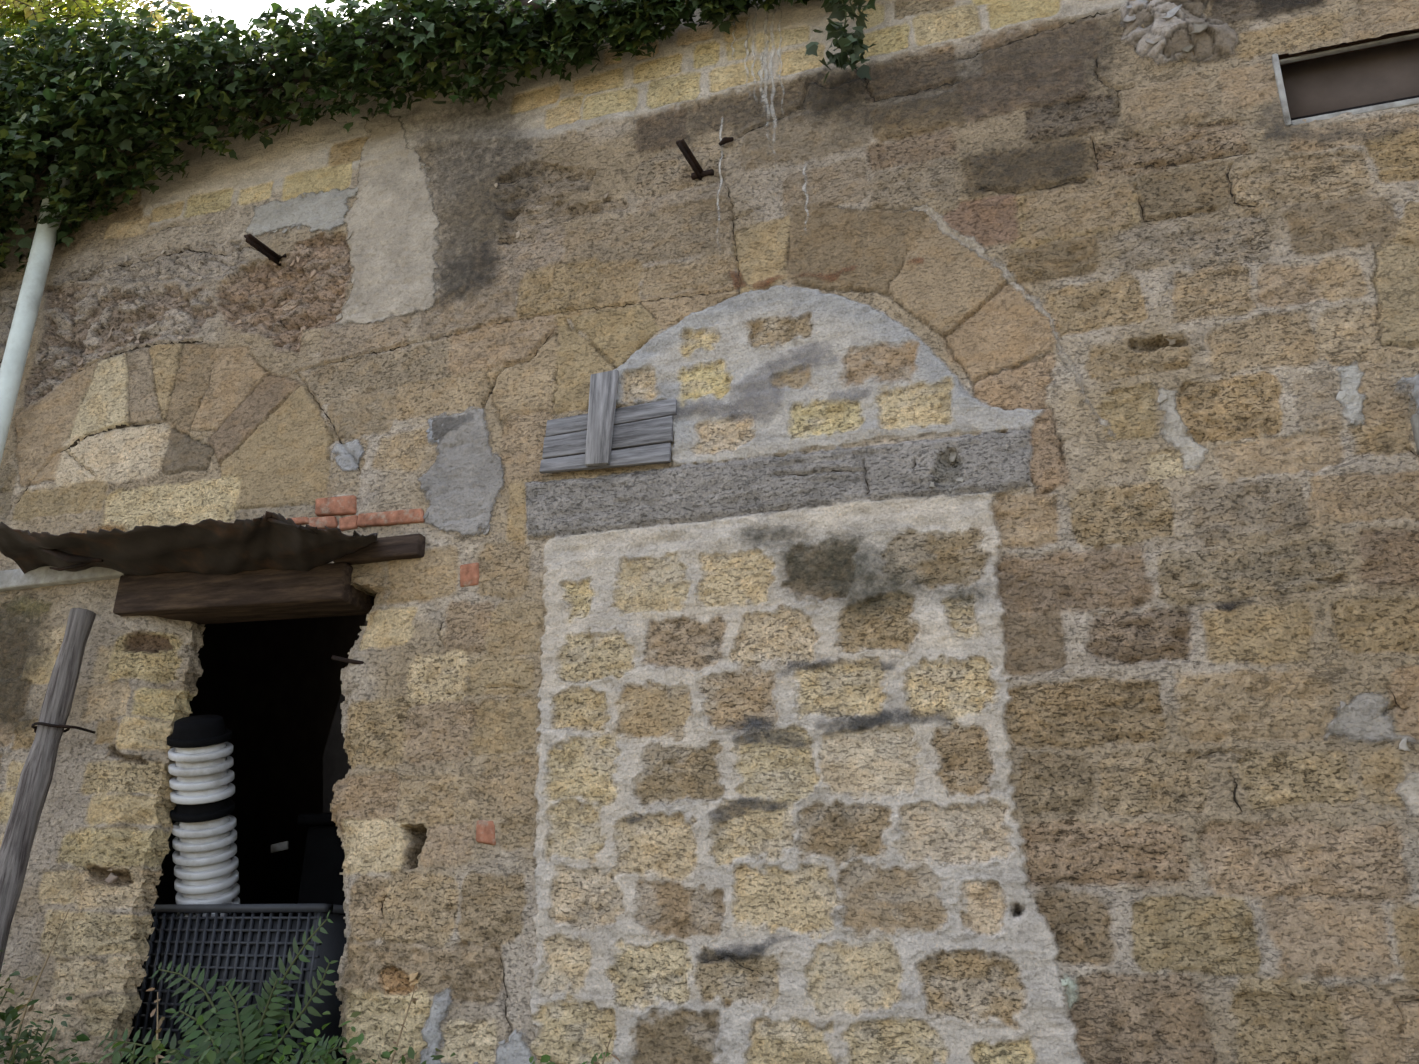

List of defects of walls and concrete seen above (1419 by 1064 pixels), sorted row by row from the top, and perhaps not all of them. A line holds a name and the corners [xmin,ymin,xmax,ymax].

spalling [494,160,631,246]
peeling [25,111,440,409]
spalling [123,631,176,653]